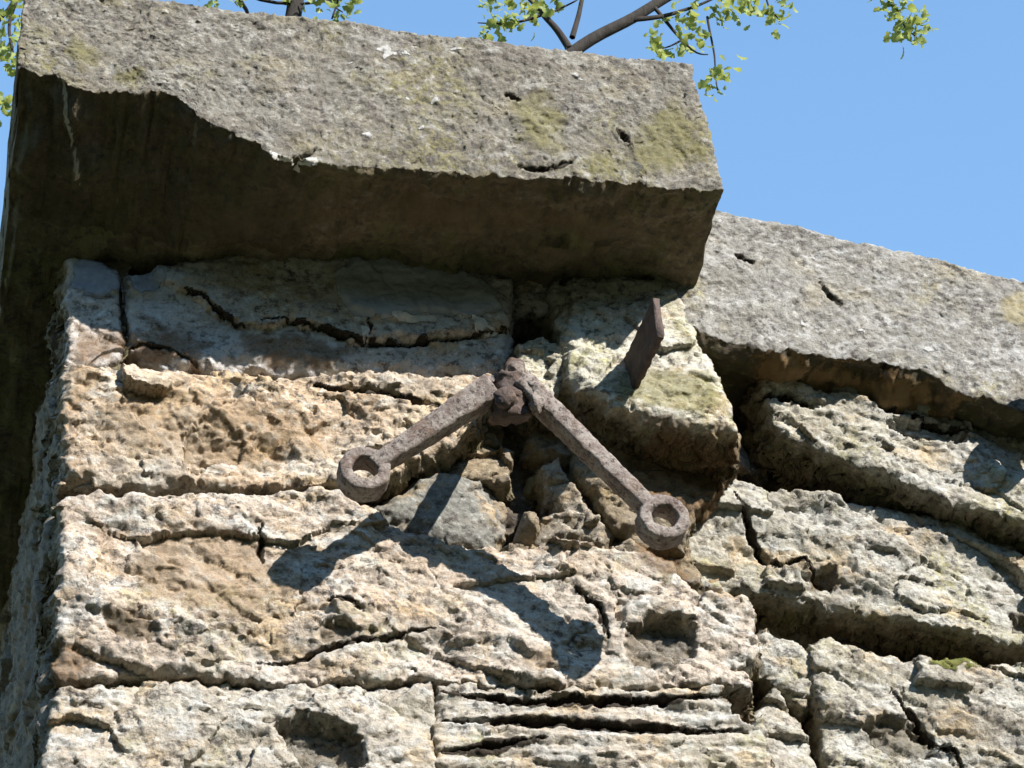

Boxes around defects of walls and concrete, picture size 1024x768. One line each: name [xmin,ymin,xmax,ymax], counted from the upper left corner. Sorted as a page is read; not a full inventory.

crack [91,283,197,368]
crack [184,286,510,349]
rust [631,417,730,520]
crack [257,526,265,564]
rust [638,543,685,579]
crack [734,492,837,592]